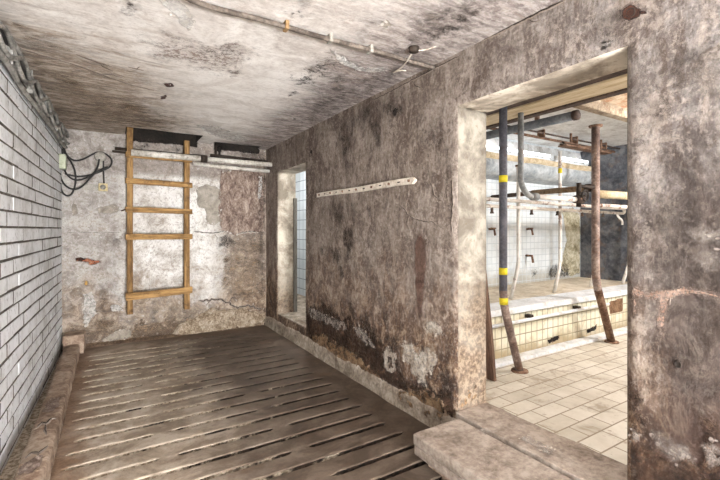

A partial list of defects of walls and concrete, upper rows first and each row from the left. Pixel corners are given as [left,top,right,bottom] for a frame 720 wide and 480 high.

damp [154,33,243,74]
spalling [196,170,265,236]
crack [199,296,262,310]
crack [636,290,716,302]
damp [306,303,454,418]
damp [631,392,720,480]